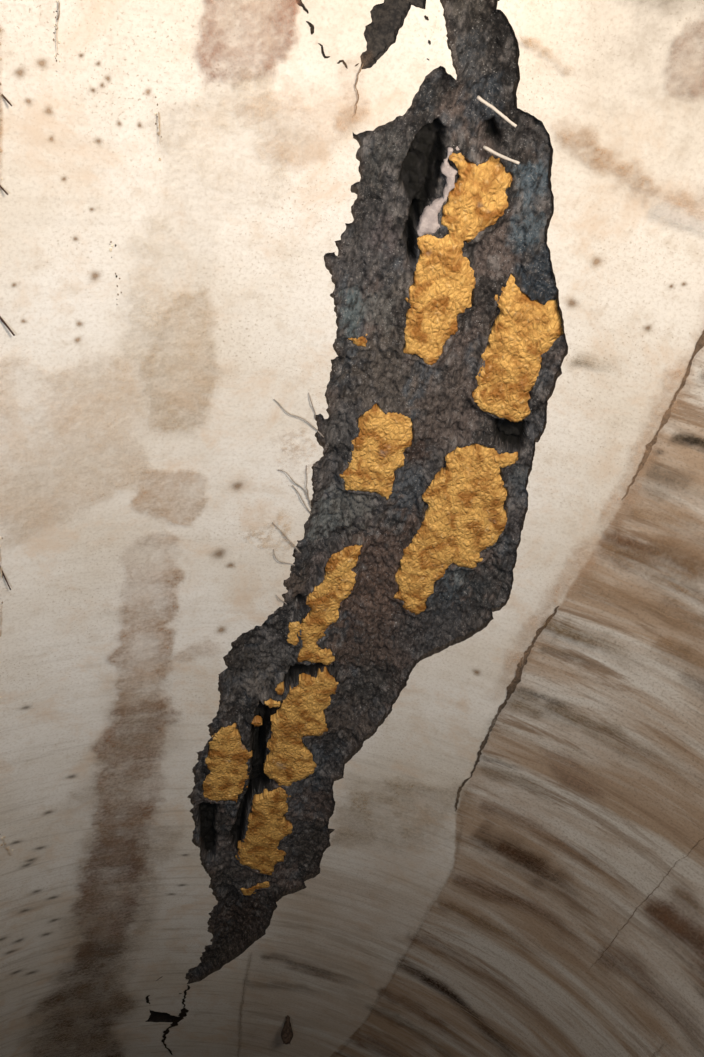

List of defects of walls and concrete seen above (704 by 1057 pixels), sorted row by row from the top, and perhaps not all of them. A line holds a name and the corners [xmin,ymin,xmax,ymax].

spalling [185,0,568,984]
crack [622,330,704,500]
crack [455,606,559,811]
damp [44,801,154,1057]
crack [146,977,190,1055]